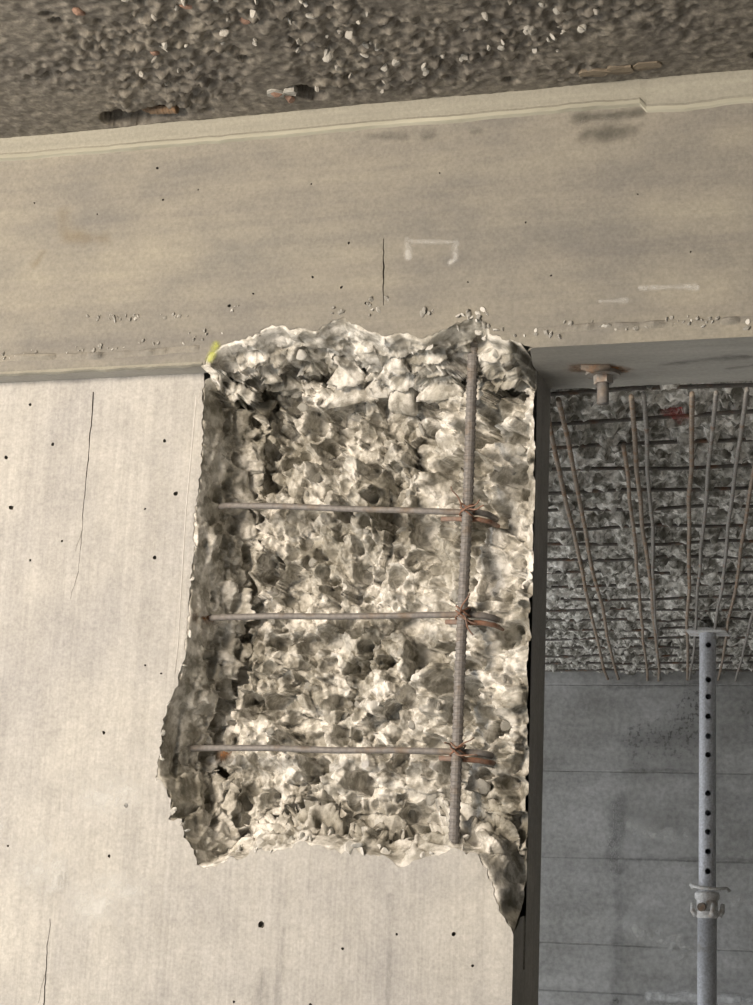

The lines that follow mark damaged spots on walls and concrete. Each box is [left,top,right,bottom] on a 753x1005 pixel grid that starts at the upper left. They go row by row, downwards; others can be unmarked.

crack [70,392,94,599]
spalling [156,317,537,934]
spalling [545,383,753,681]
crack [39,924,51,1005]